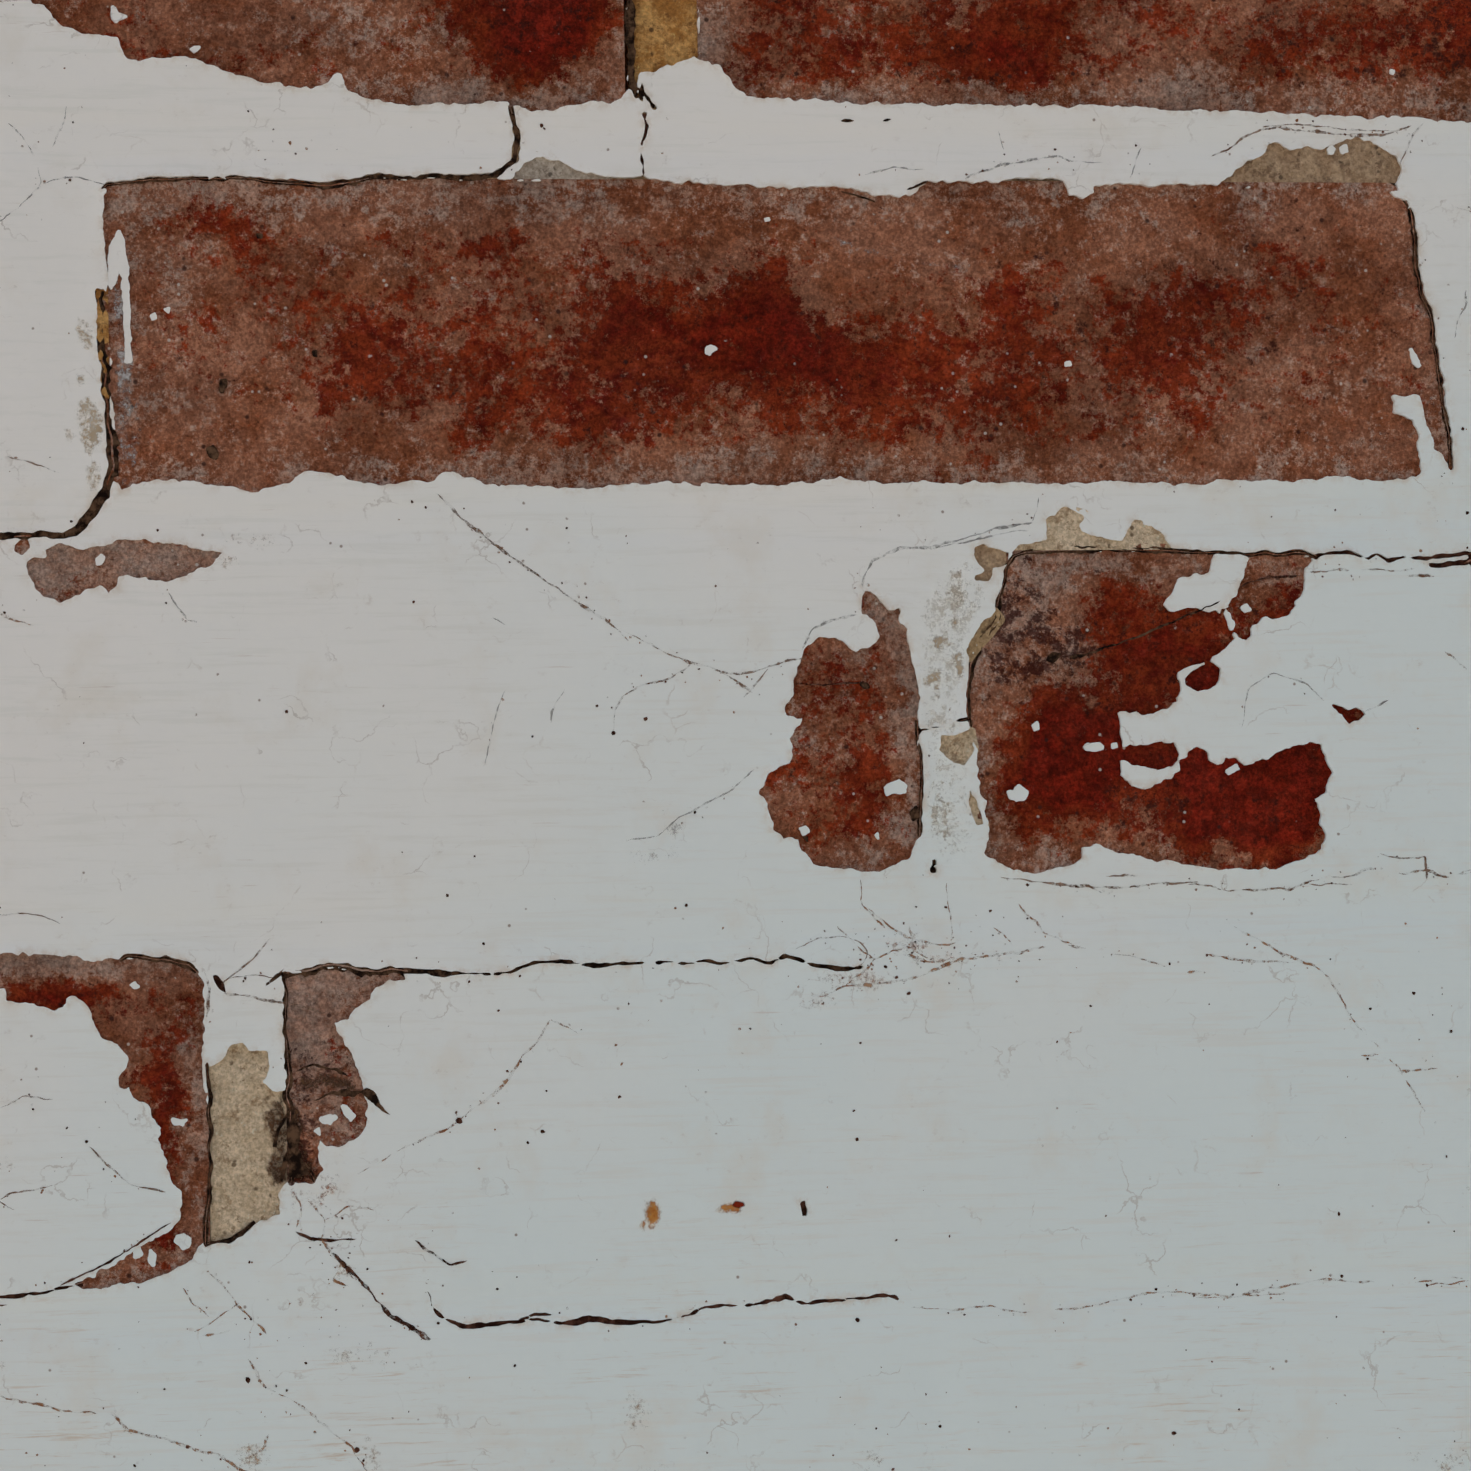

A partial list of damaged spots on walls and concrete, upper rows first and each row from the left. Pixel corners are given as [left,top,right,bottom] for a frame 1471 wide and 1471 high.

peeling [31,0,1471,123]
peeling [95,138,1453,493]
peeling [14,535,221,603]
crack [438,494,864,730]
peeling [759,507,1332,874]
crack [864,498,1471,837]
peeling [0,952,408,1289]
crack [119,854,1468,1340]